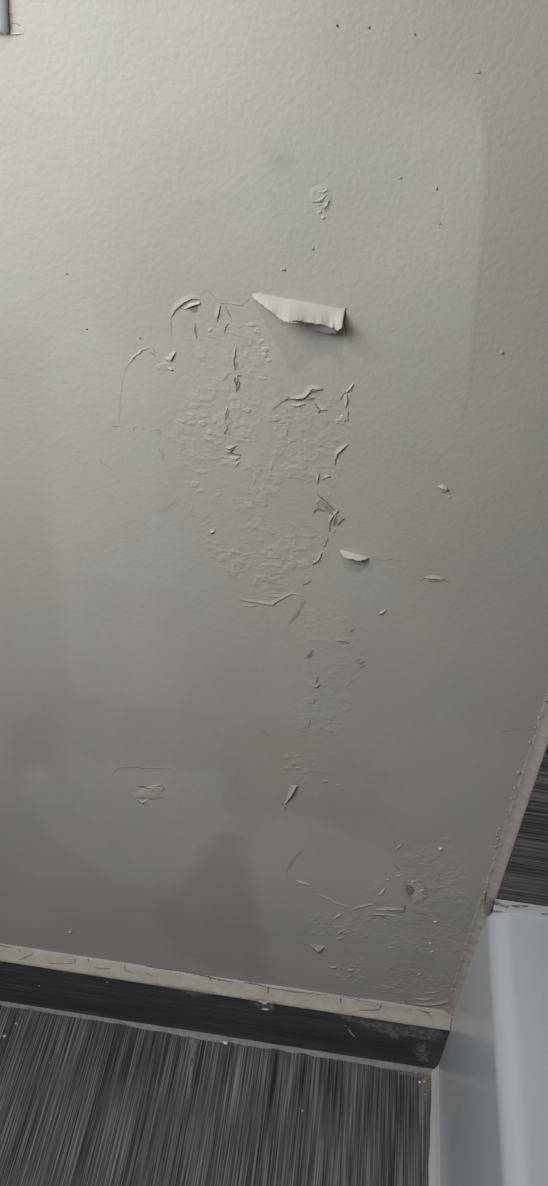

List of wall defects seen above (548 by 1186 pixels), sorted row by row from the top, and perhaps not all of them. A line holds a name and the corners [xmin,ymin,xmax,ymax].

peeling [252,292,347,334]
peeling [313,495,344,533]
peeling [340,550,398,561]